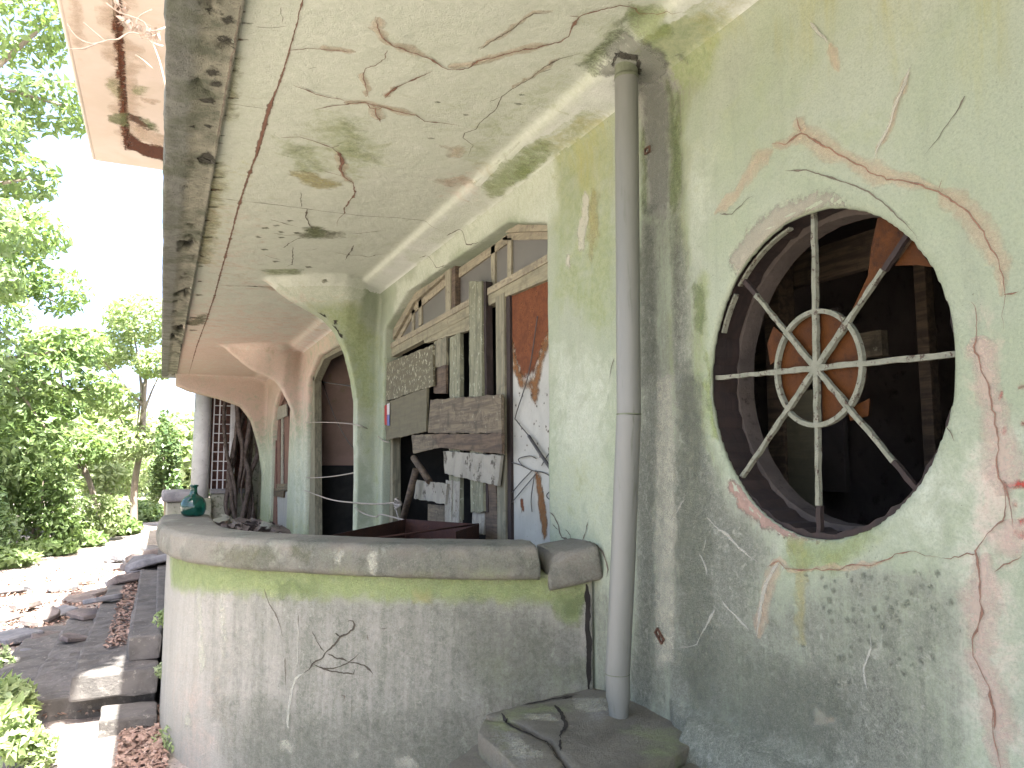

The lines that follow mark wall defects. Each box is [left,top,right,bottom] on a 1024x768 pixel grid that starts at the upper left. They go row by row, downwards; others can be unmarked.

corrosion [112,0,163,161]
crack [189,0,680,372]
flaking render [729,191,844,275]
crack [929,96,965,149]
damp [186,315,206,331]
crack [707,116,1022,768]
crack [264,589,386,728]
crack [501,513,609,768]